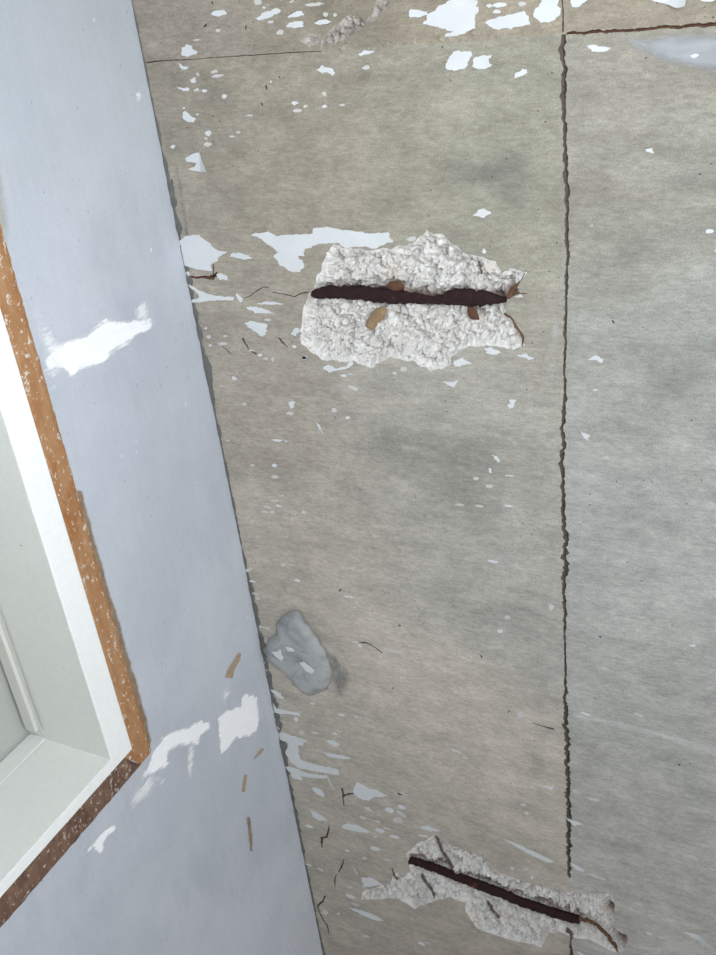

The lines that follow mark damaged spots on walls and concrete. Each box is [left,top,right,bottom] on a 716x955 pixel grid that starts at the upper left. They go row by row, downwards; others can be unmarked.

spalling [254,0,390,49]
peeling [409,0,587,37]
peeling [652,0,686,8]
spalling [252,227,533,391]
crack [533,0,573,878]
spalling [321,782,629,955]